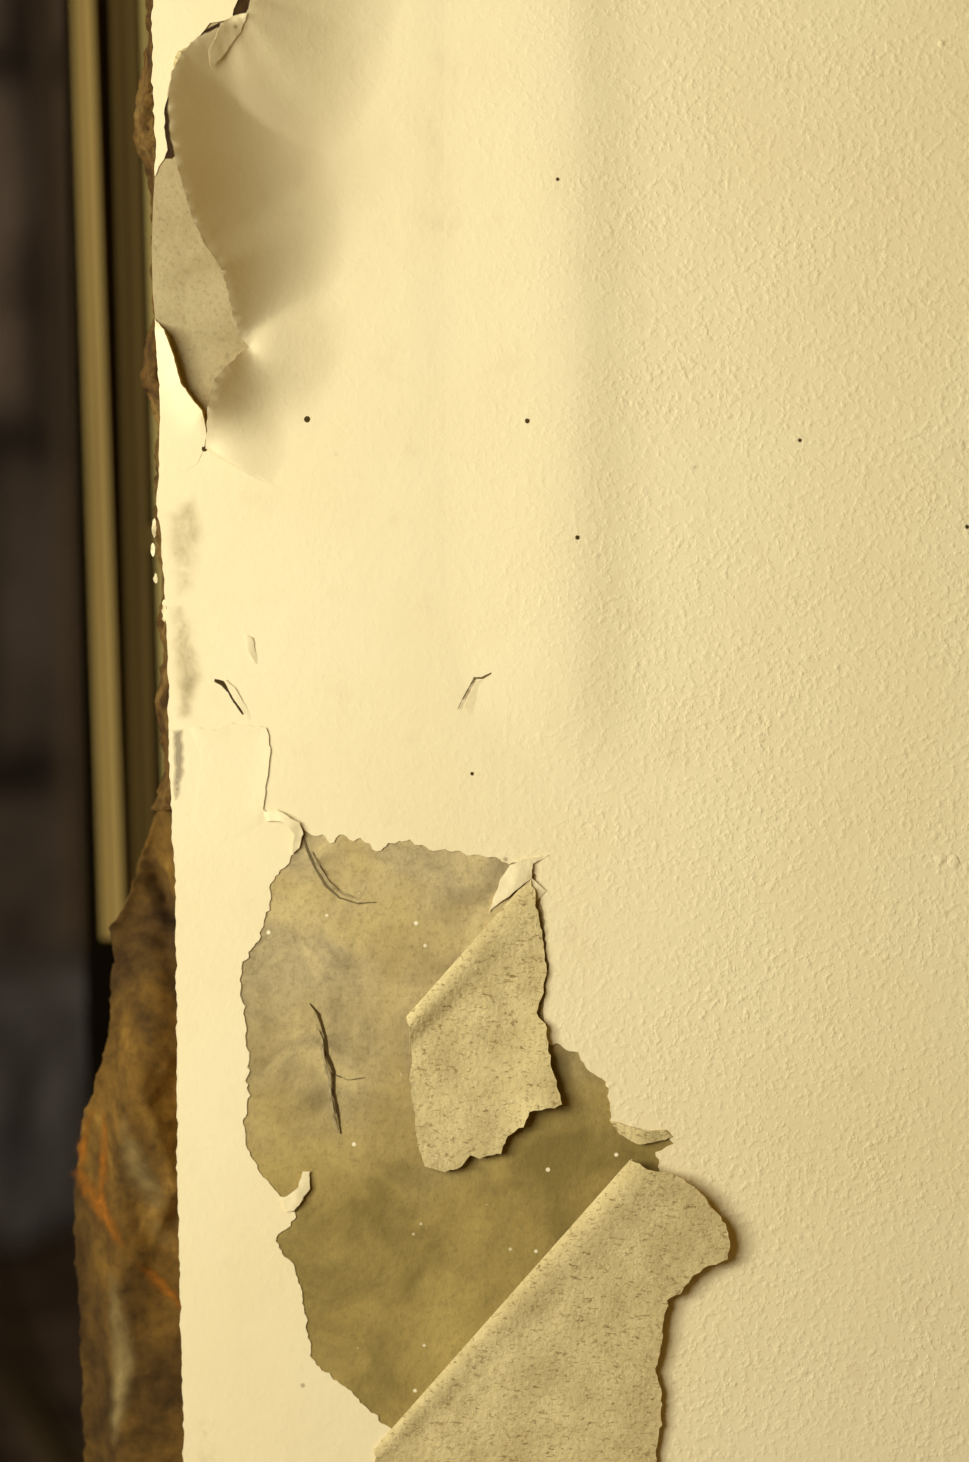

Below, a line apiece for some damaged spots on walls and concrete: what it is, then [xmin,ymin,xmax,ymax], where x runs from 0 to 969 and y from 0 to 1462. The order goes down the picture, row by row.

peeling [73,0,443,1462]
crack [310,1004,365,1134]
peeling [189,722,730,1462]